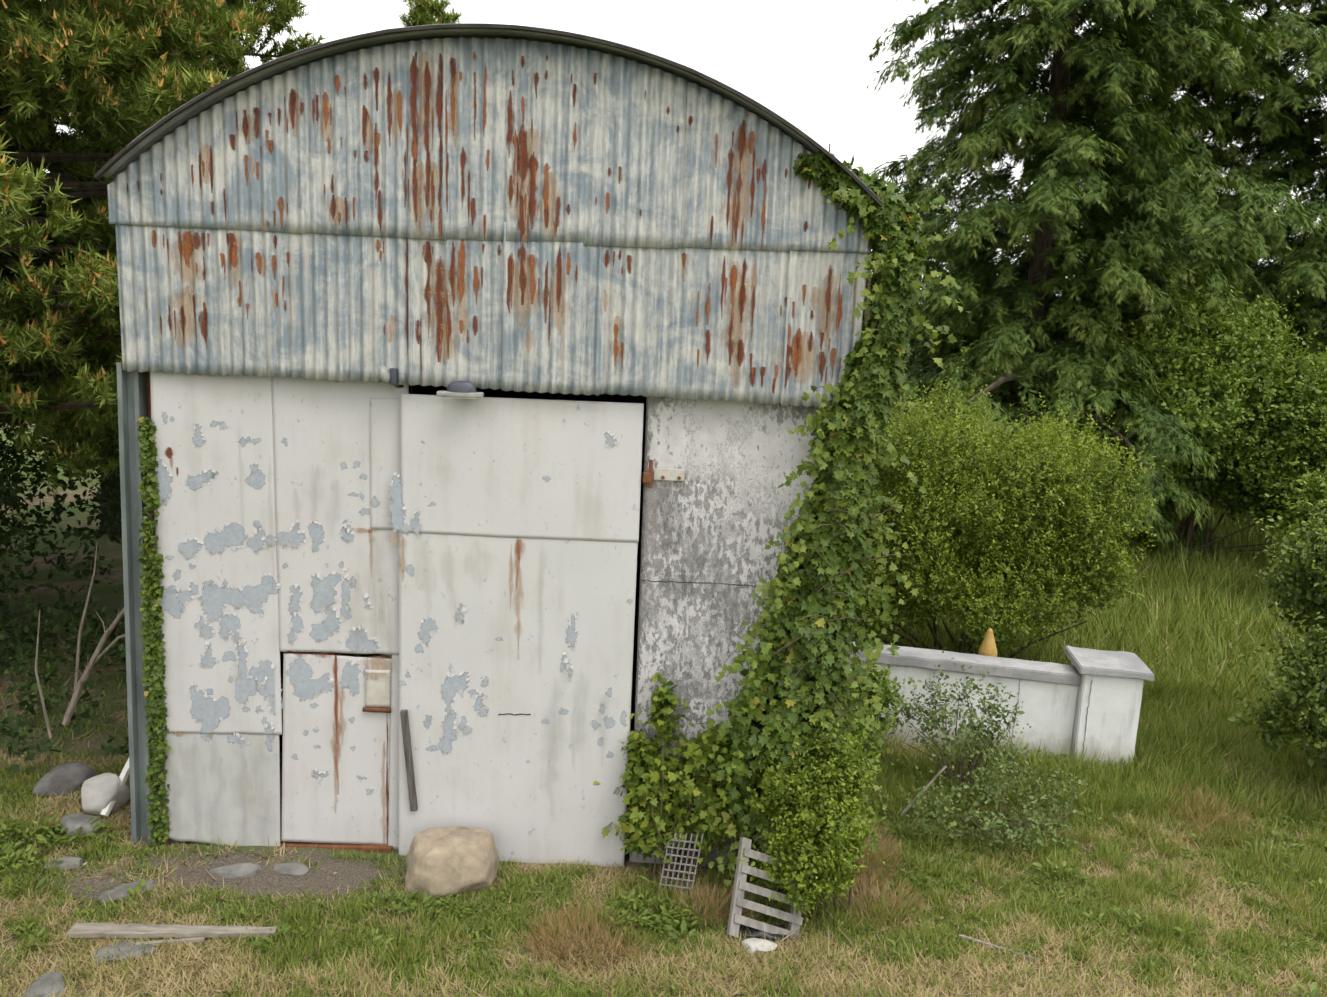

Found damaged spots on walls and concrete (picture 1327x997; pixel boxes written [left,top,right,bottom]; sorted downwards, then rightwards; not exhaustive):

corrosion [152,146,289,348]
corrosion [230,52,578,370]
corrosion [696,120,870,393]
peeling [154,459,436,752]
corrosion [319,653,343,786]
peeling [415,618,440,653]
peeling [424,670,490,756]
corrosion [510,539,521,636]
peeling [559,612,578,683]